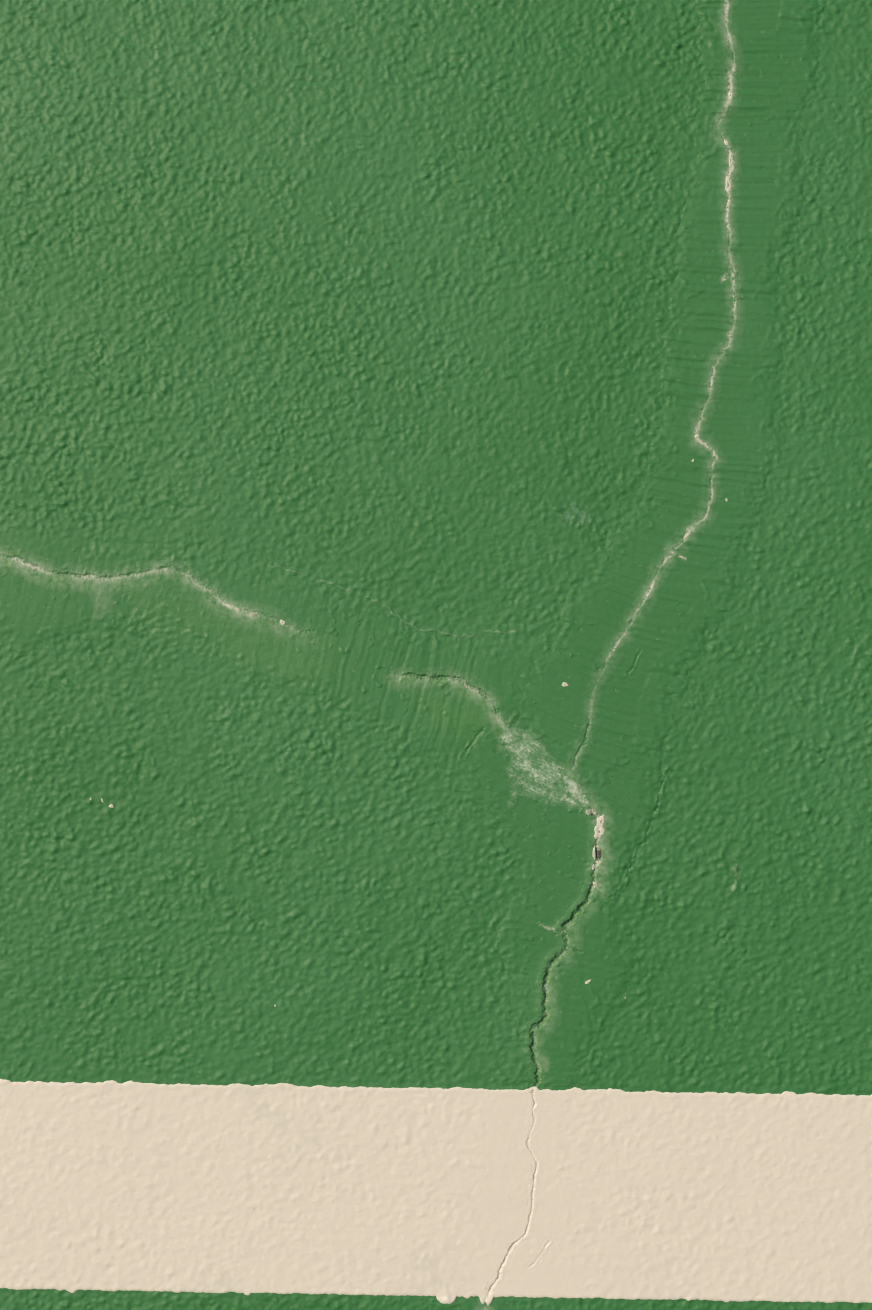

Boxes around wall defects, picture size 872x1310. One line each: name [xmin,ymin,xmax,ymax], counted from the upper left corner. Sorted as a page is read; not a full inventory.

crack [0,543,318,647]
crack [381,662,522,732]
crack [471,0,747,1310]